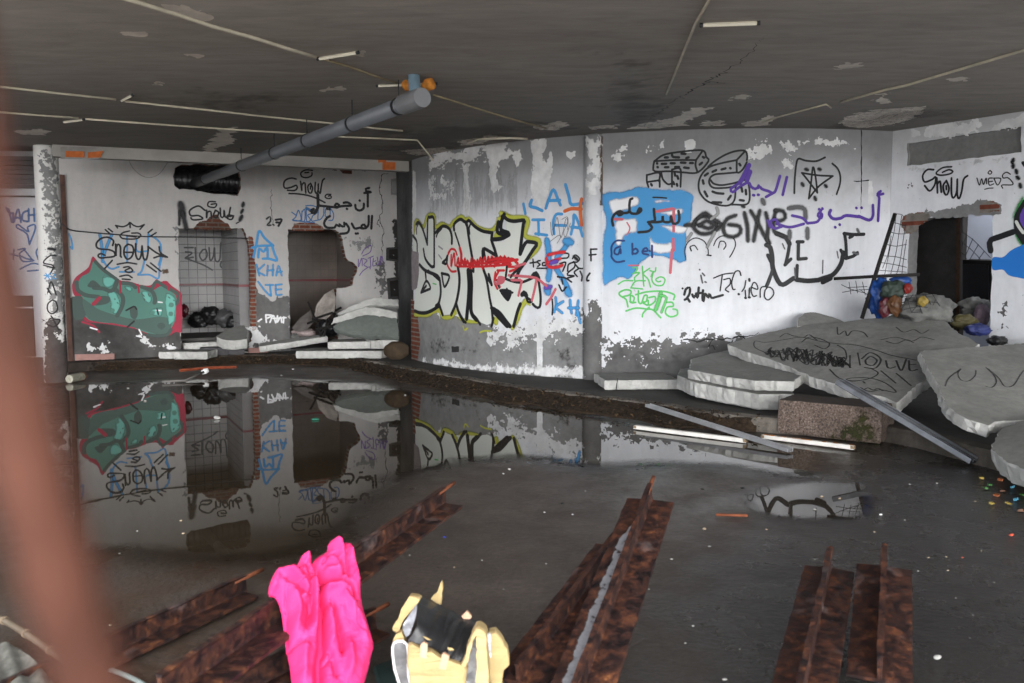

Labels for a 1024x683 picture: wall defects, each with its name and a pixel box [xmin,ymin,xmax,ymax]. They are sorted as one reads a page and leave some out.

peeling [741,115,856,169]
peeling [838,93,1024,139]
peeling [16,129,182,383]
peeling [342,232,373,251]
peeling [378,107,746,380]
spalling [901,199,1002,234]